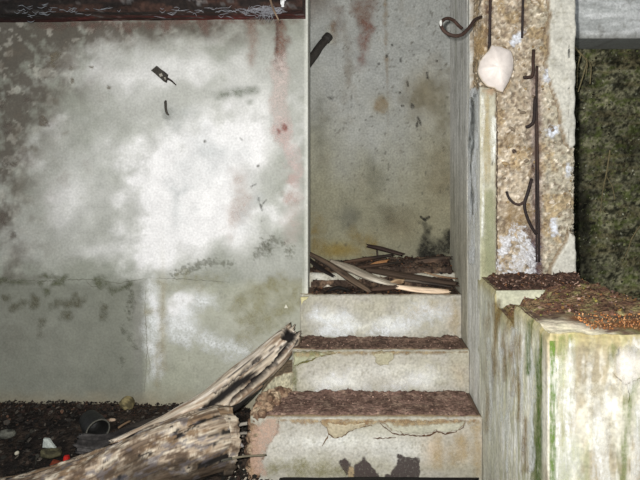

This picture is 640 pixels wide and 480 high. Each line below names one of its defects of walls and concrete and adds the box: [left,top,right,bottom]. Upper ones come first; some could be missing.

leakage [468,88,541,274]
spalling [472,0,575,275]
peeling [293,350,446,366]
peeling [250,419,476,477]
crack [320,421,464,446]
leakage [549,341,583,480]
leakage [591,389,610,480]